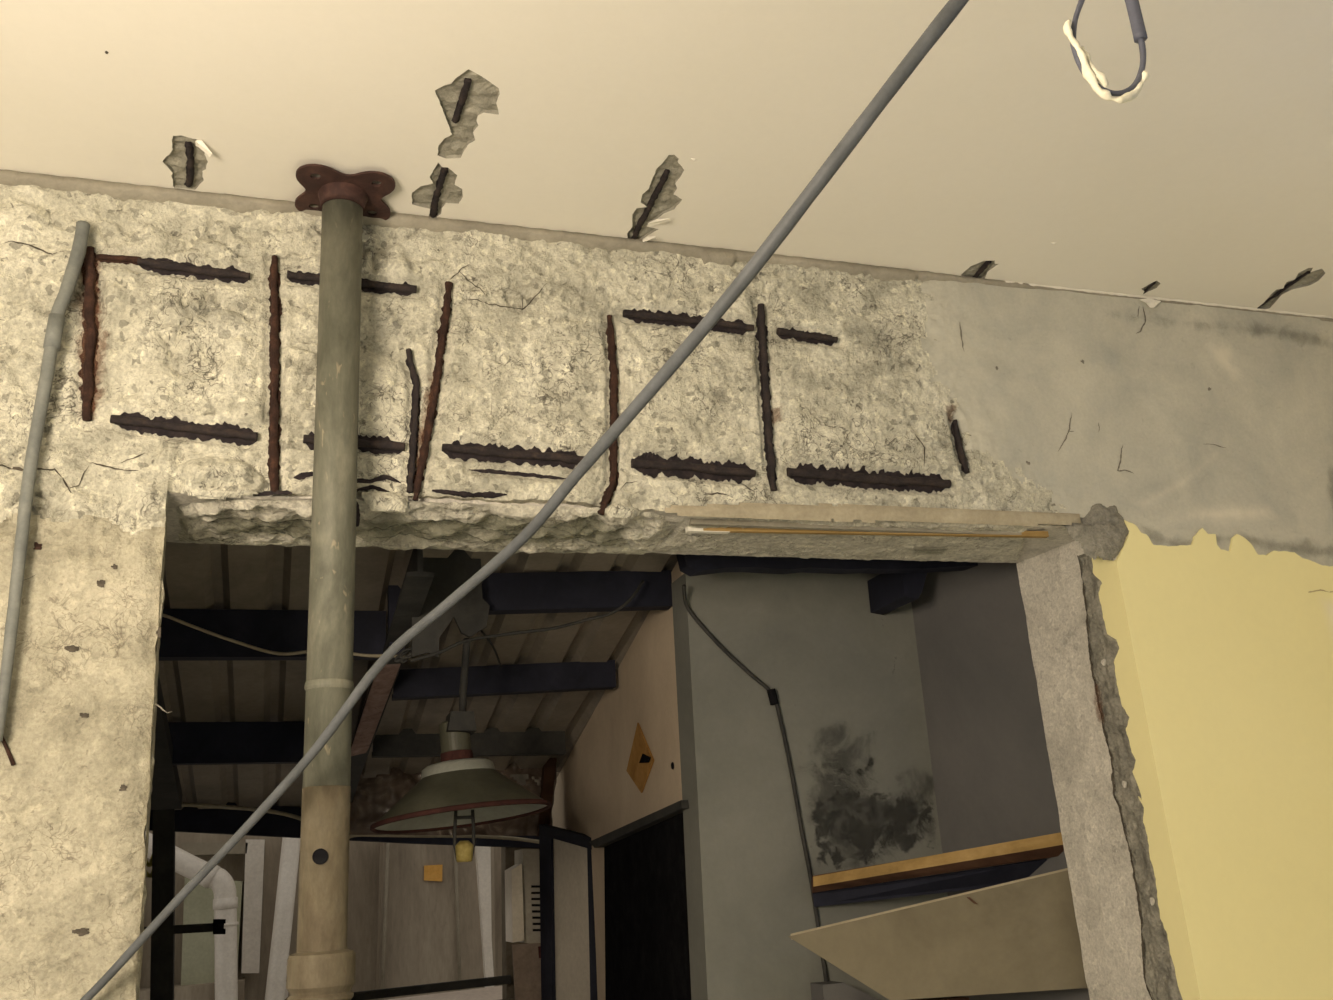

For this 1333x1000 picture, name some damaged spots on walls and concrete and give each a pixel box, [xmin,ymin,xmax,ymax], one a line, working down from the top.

crack [0,241,64,254]
crack [0,453,144,493]
spalling [0,135,322,1000]
spalling [356,69,1333,566]
mould [812,728,932,868]
spalling [1077,554,1183,1000]